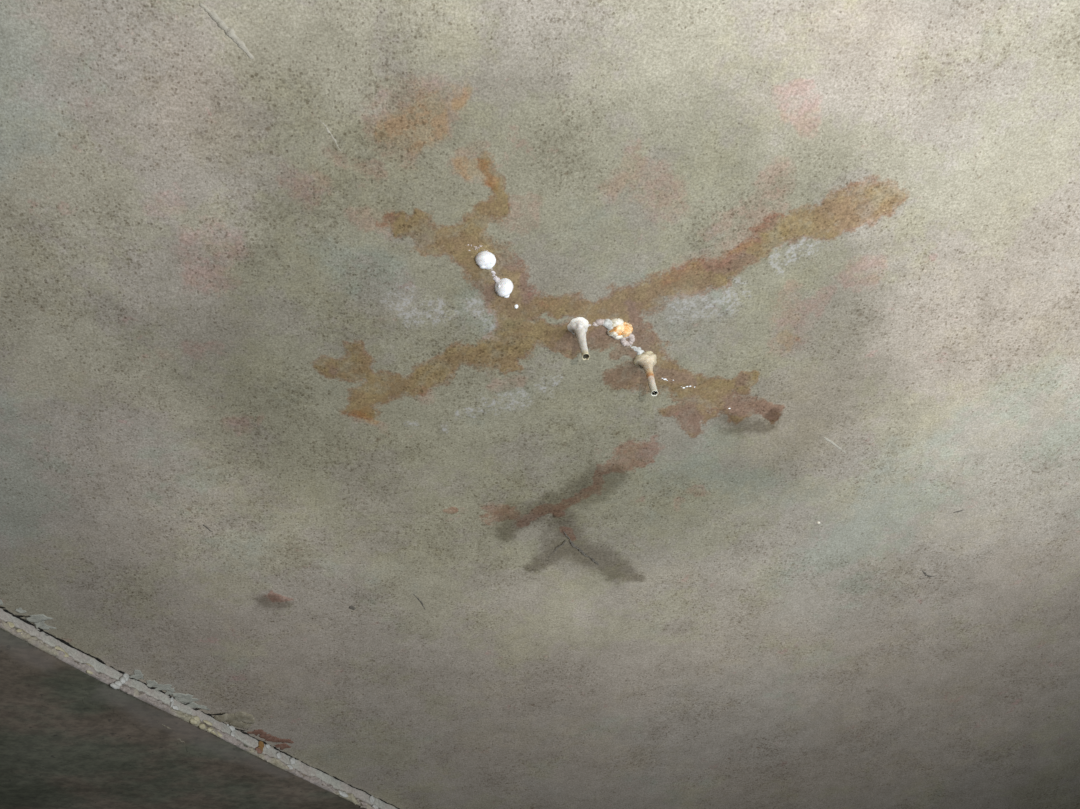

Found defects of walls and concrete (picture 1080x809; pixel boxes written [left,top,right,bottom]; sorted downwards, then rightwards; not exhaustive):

corrosion [351,55,480,180]
water stain [56,0,967,674]
corrosion [301,147,914,440]